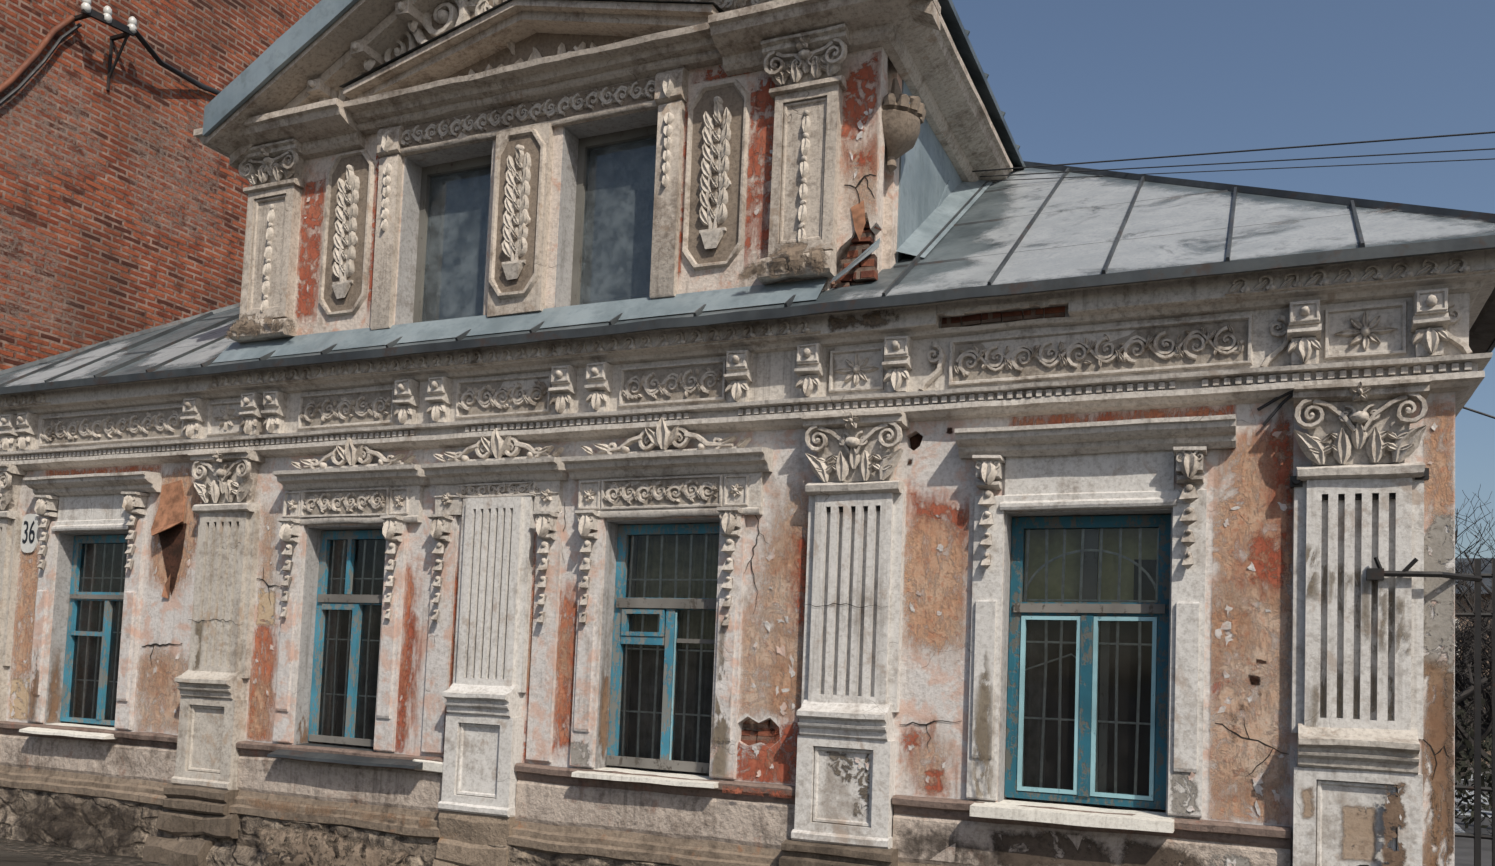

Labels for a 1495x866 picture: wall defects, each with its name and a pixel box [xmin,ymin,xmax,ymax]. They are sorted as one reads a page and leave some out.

peeling [225,181,325,340]
spalling [678,54,882,288]
crack [844,174,876,203]
peeling [1013,405,1235,426]
peeling [247,513,276,741]
peeling [726,490,808,797]
peeling [904,492,969,654]
peeling [1171,417,1315,824]
flaking render [1423,403,1455,674]
peeling [903,730,946,795]
crack [1215,721,1287,777]
flaking render [1342,782,1407,866]